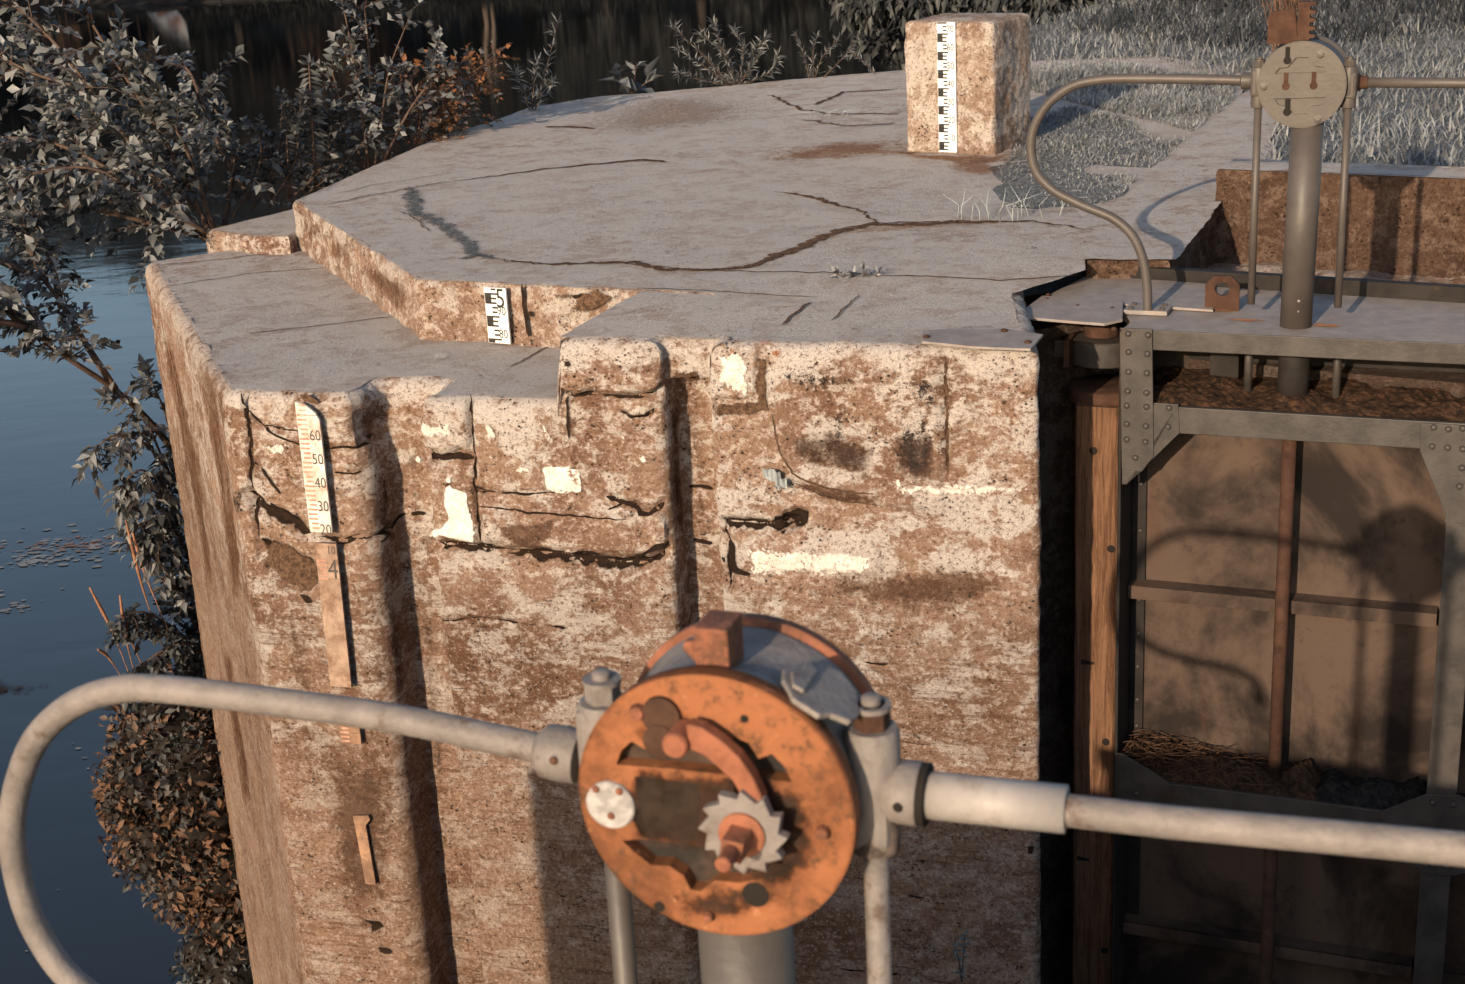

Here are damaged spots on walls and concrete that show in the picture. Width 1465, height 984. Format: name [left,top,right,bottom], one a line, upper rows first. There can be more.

crack [771,89,897,126]
crack [324,126,1092,367]
crack [241,393,426,544]
water stain [796,408,865,470]
water stain [896,420,931,478]
peeling [430,477,475,542]
crack [693,537,712,545]
spalling [728,540,742,575]
spalling [781,508,808,534]